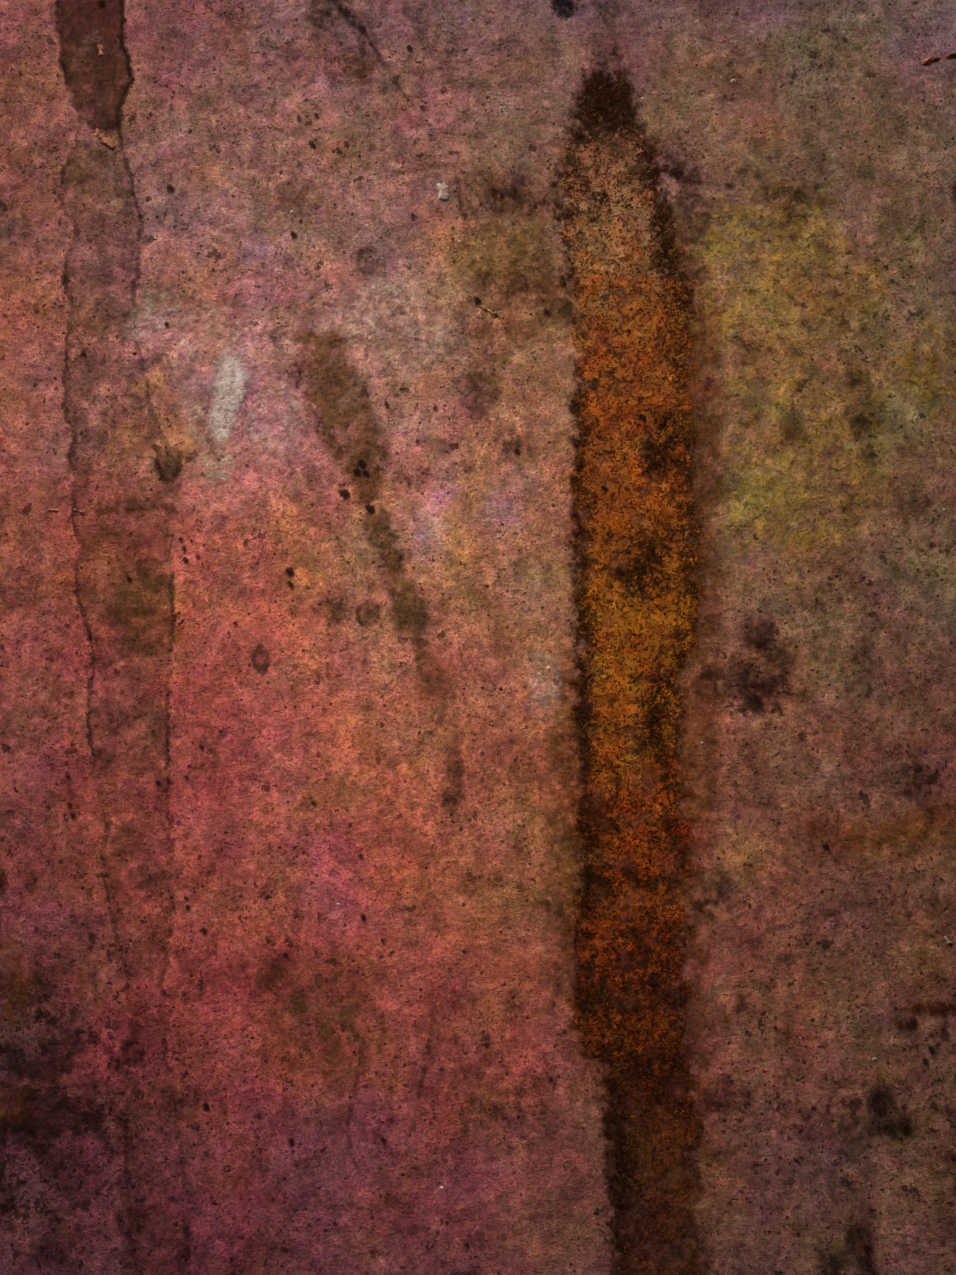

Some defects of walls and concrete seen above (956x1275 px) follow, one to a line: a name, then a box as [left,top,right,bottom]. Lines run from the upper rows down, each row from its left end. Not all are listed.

leakage [55,0,134,141]
leakage [63,262,73,299]
leakage [131,258,144,369]
leakage [287,332,450,725]
leakage [86,710,95,759]
corrosion [534,68,722,1275]